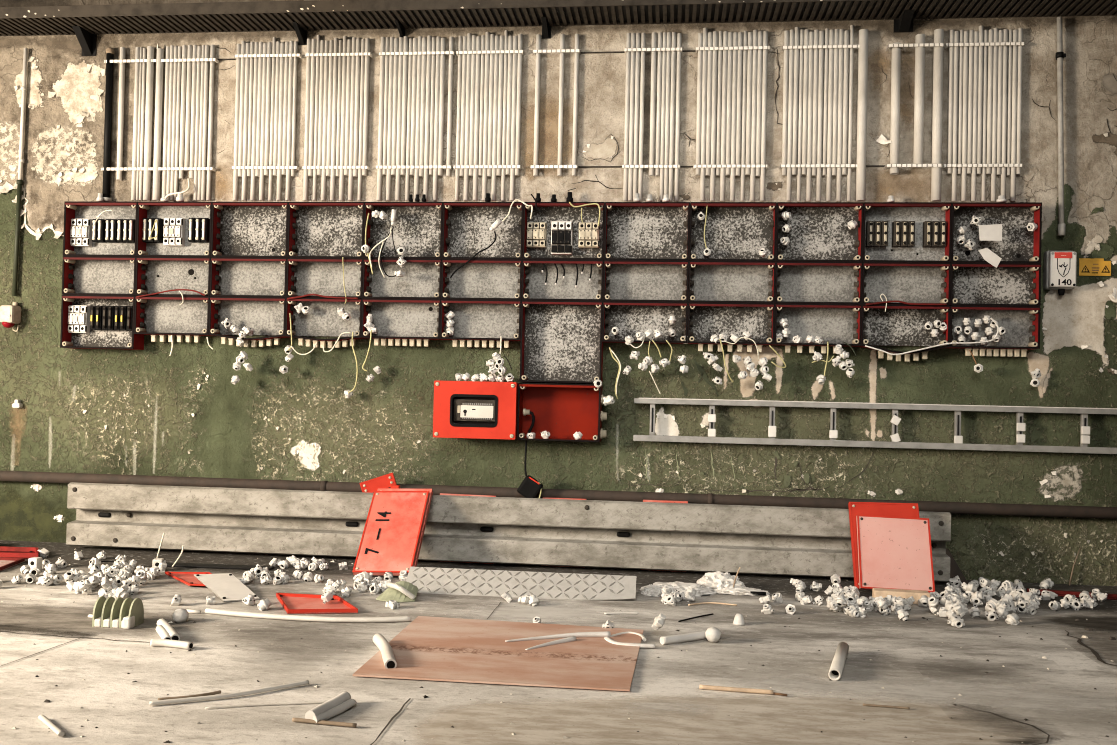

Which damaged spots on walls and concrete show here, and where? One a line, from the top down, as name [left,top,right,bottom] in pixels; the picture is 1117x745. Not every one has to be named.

peeling [0,56,105,240]
peeling [1042,234,1117,375]
peeling [291,440,321,471]
peeling [1039,463,1083,502]
crack [1065,630,1117,666]
crack [959,704,1050,745]